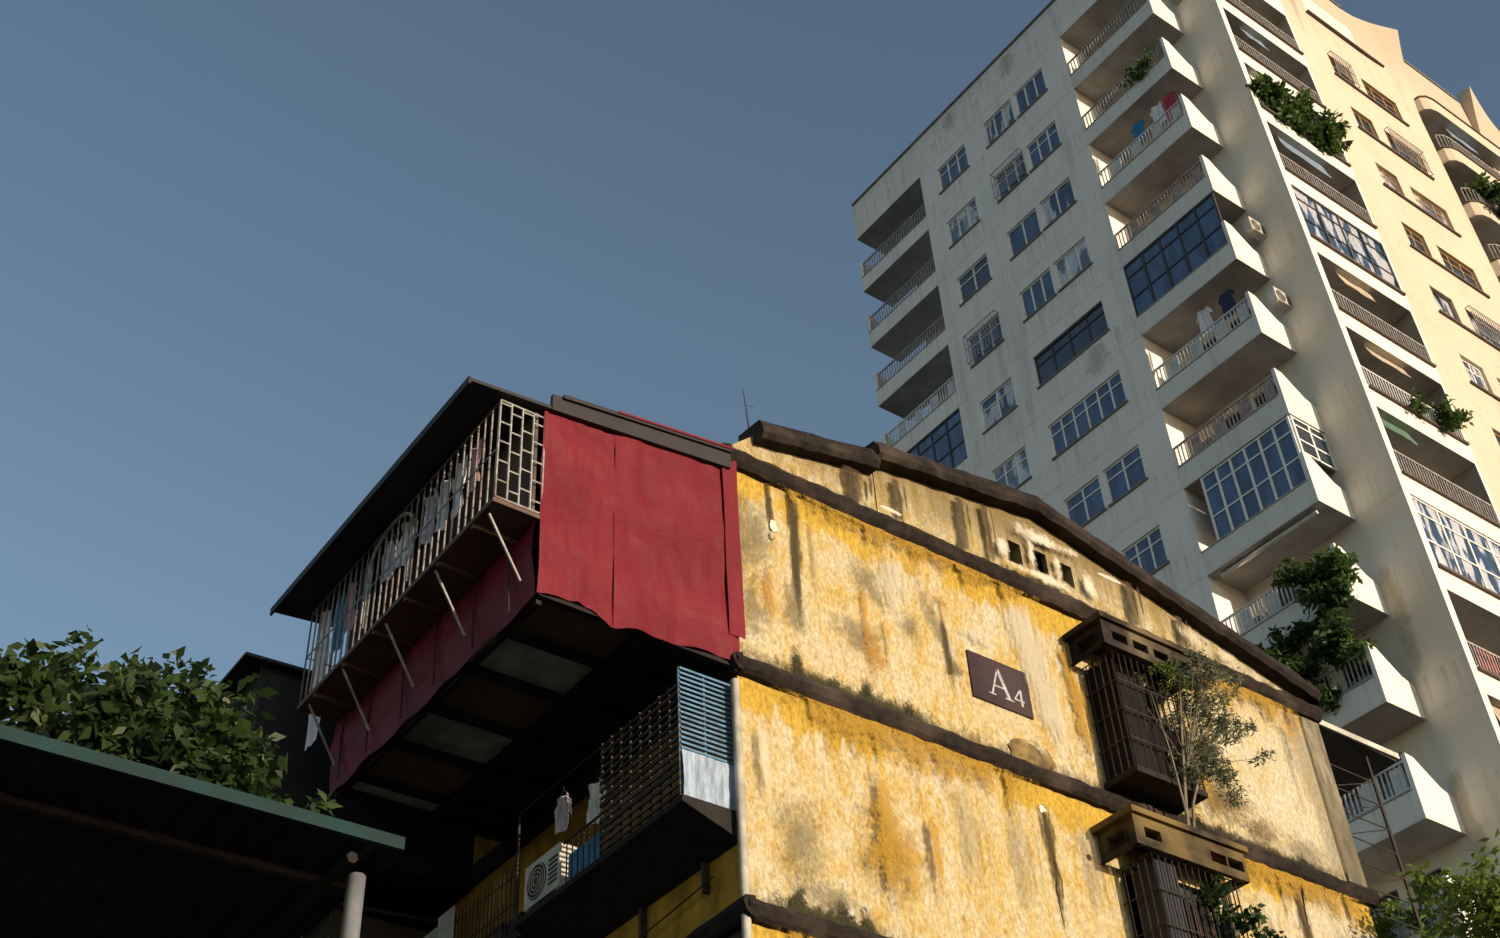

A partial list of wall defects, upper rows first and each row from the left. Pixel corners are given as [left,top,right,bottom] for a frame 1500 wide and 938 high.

damp [740,465,1095,754]
damp [1193,668,1295,726]
damp [758,725,772,791]
damp [786,692,1023,901]
damp [1197,751,1277,842]
damp [1243,858,1362,936]